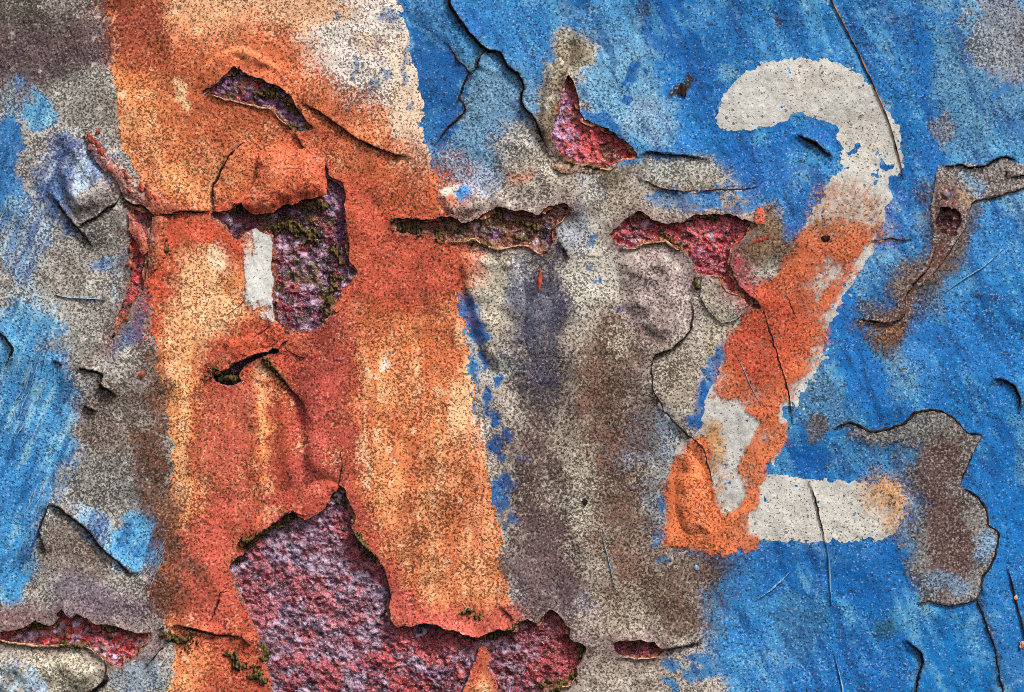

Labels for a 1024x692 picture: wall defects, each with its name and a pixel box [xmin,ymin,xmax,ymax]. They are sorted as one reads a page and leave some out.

peeling [202,66,312,131]
crack [437,0,549,149]
peeling [551,76,637,174]
peeling [201,137,357,385]
peeling [390,203,570,256]
peeling [609,207,770,323]
peeling [856,158,1024,326]
crack [651,298,714,484]
crack [764,312,794,422]
peeling [836,408,1000,609]
peeling [0,609,152,666]
peeling [230,480,589,692]